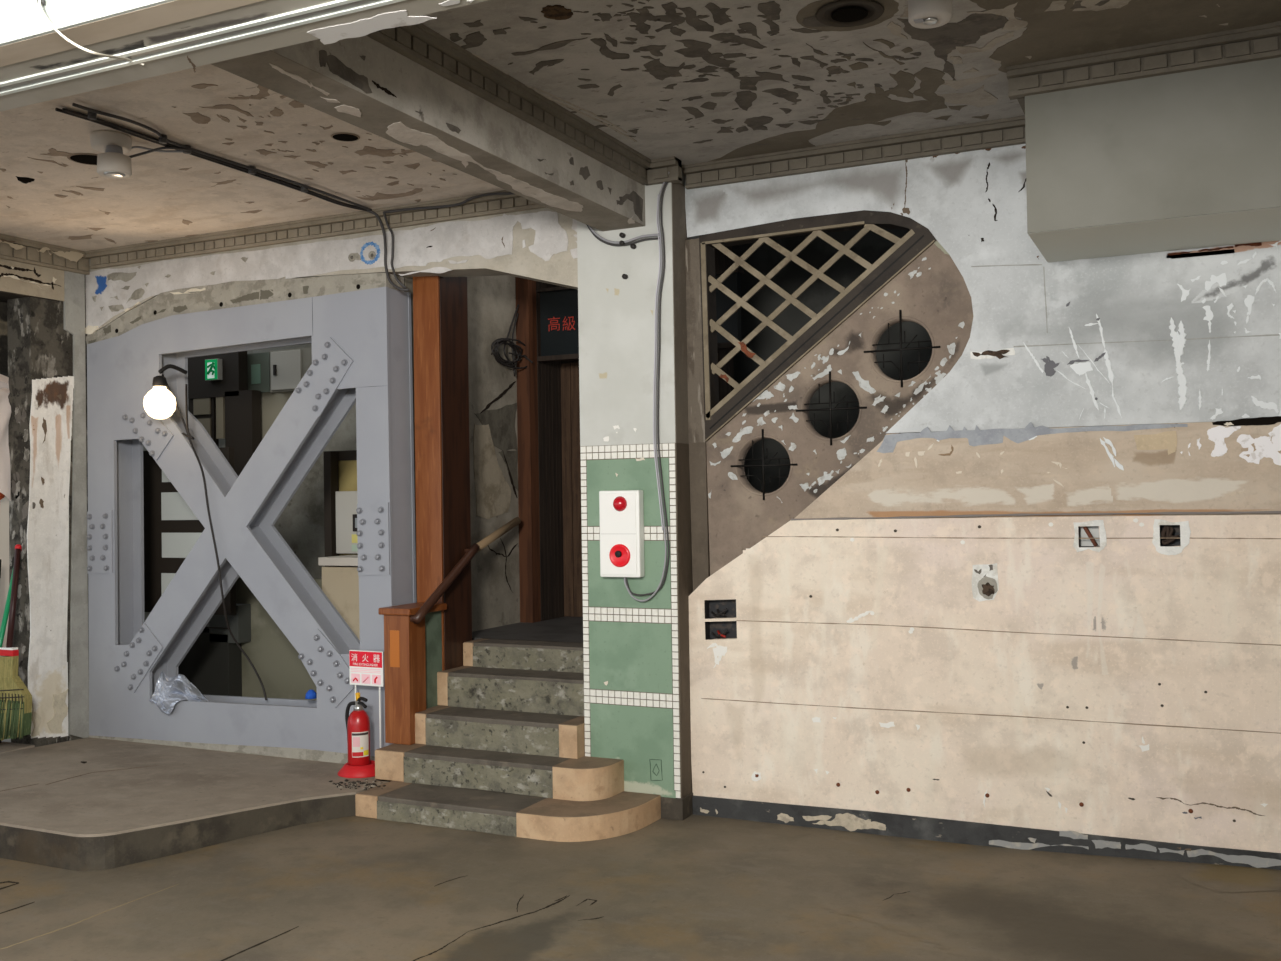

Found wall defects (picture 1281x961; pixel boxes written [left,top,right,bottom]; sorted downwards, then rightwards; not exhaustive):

peeling [307,0,474,98]
peeling [508,0,1281,162]
peeling [85,55,643,334]
crack [981,162,1026,242]
crack [0,264,60,290]
peeling [1177,252,1257,333]
peeling [710,314,1281,493]
crack [473,381,518,591]
peeling [777,813,886,831]
peeling [989,831,1281,868]
crack [413,895,602,961]
water stain [414,900,603,961]